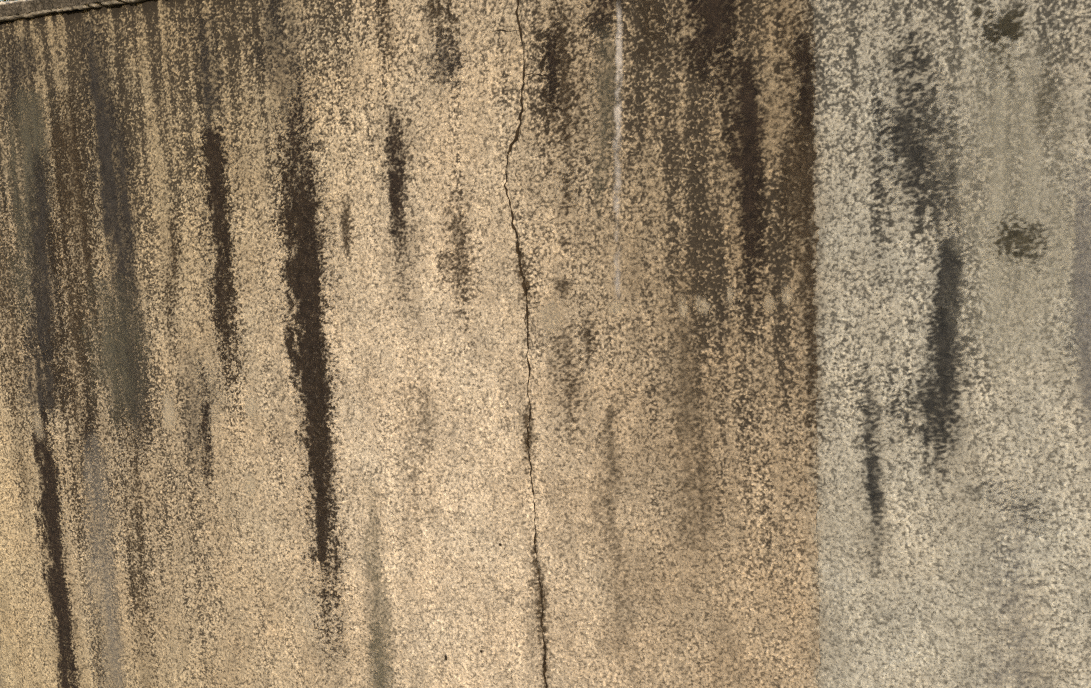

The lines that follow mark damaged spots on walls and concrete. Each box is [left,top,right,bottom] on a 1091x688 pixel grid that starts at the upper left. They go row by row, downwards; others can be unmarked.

leakage [0,22,147,688]
leakage [200,46,238,381]
leakage [266,0,341,636]
leakage [381,113,408,274]
leakage [439,192,472,313]
crack [496,0,548,688]
leakage [538,2,581,215]
leakage [586,0,625,215]
leakage [676,0,766,292]
leakage [780,5,820,436]
leakage [860,32,971,535]
leakage [973,0,1028,80]